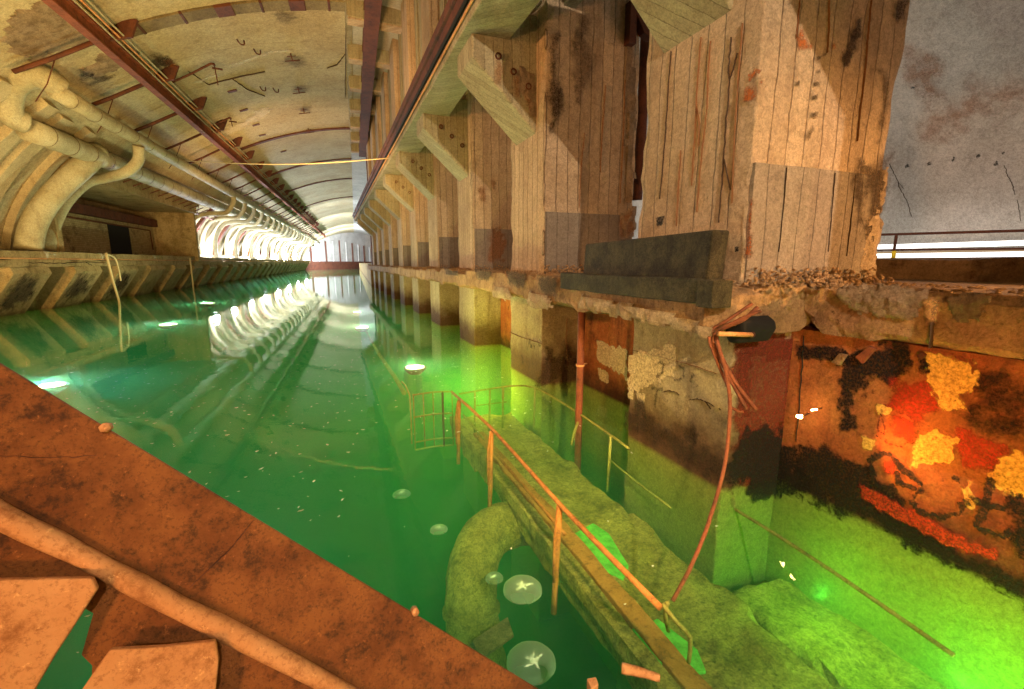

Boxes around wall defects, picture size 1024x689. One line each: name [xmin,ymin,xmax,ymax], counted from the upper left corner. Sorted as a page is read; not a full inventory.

leakage [842,18,861,66]
leakage [546,33,563,133]
spalling [836,167,929,321]
spalling [947,292,992,323]
peeling [597,341,676,402]